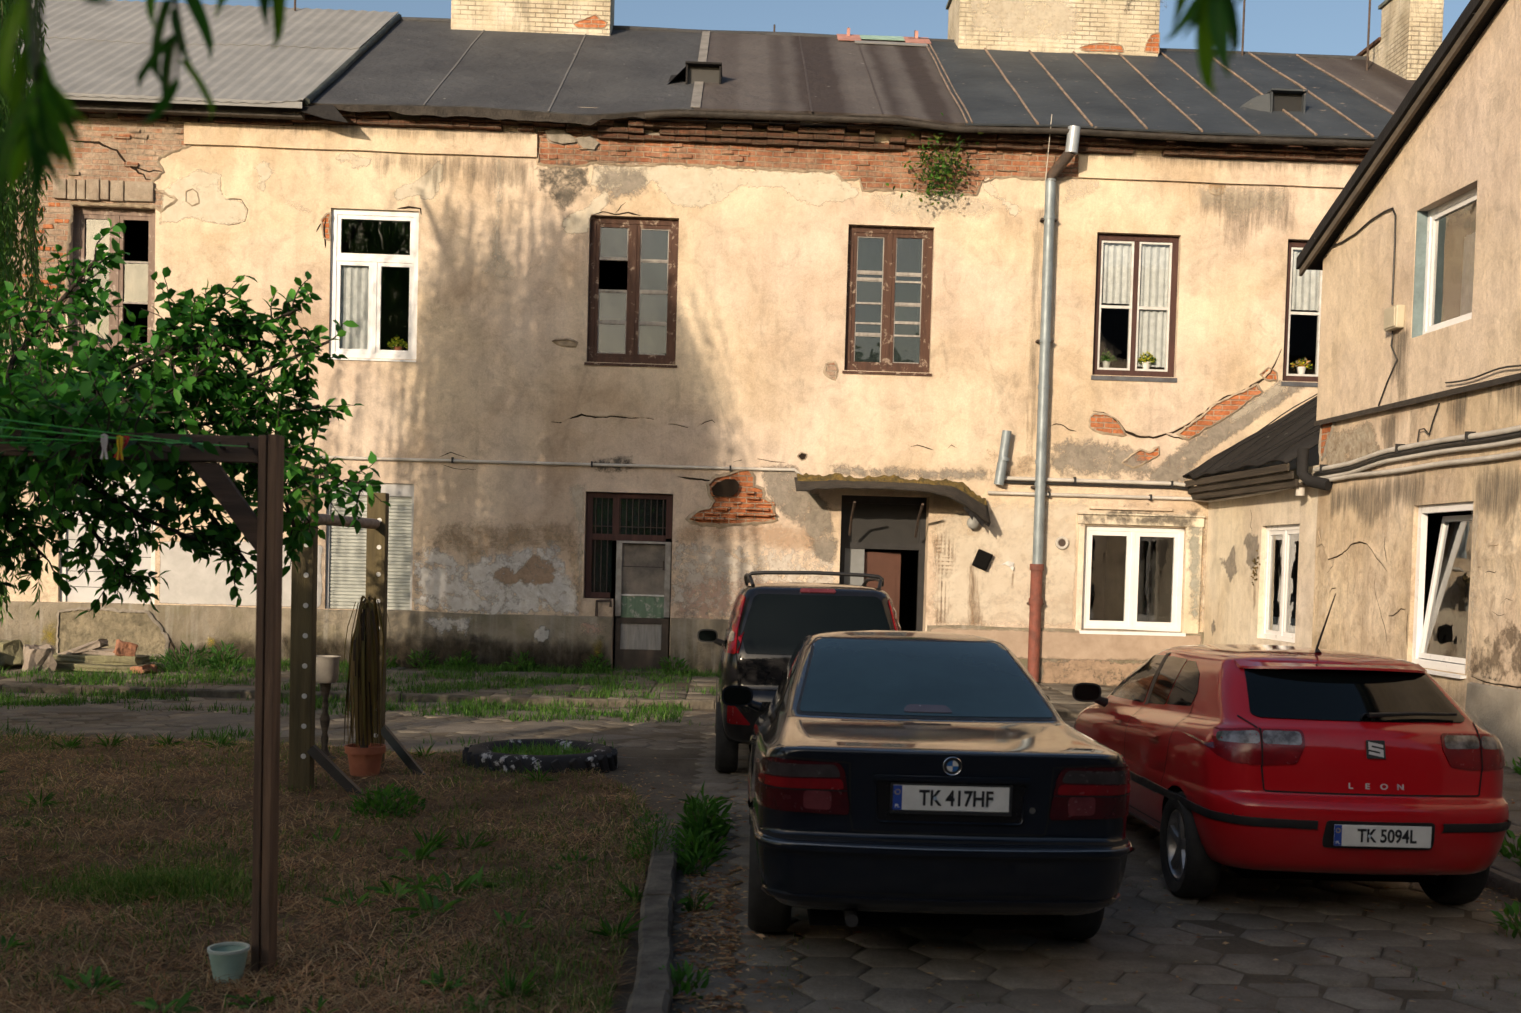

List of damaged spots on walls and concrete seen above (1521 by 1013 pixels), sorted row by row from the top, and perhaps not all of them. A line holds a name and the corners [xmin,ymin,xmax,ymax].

crack [71,140,162,180]
flaking render [535,127,1098,234]
flaking render [1,117,200,339]
crack [551,410,717,428]
crack [677,456,786,481]
spalling [1089,413,1160,469]
spalling [1177,367,1284,441]
peeling [414,488,584,616]
crack [1317,528,1408,640]